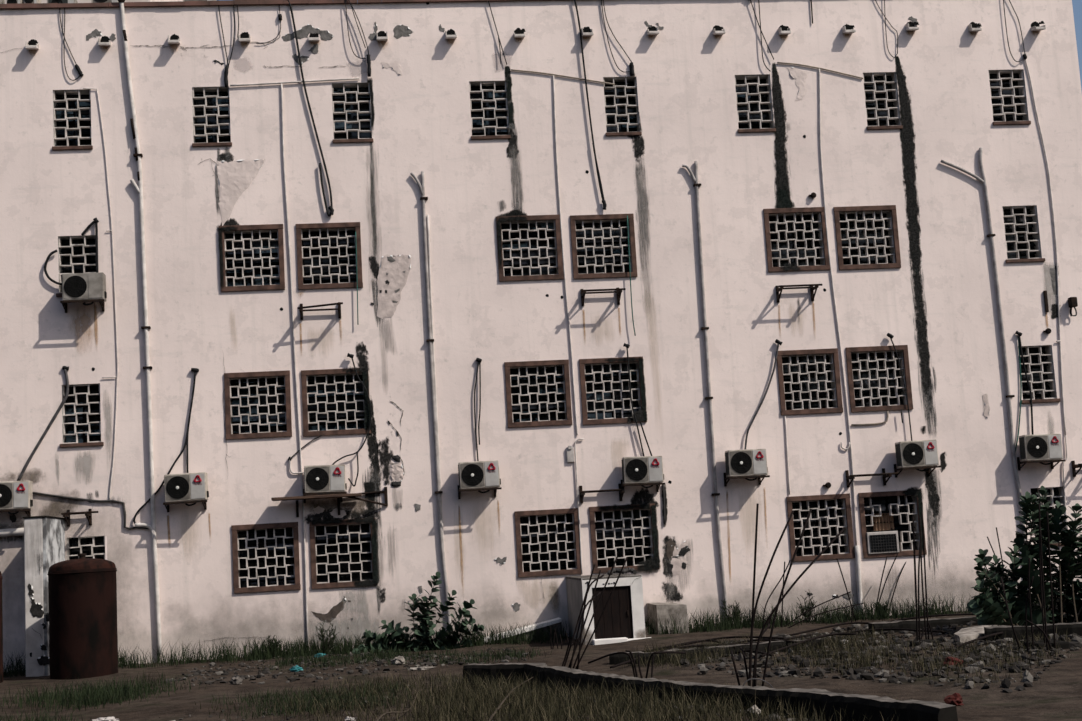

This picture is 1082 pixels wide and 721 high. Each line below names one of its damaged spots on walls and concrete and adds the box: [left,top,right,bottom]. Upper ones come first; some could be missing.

spalling [282,24,334,65]
spalling [393,24,413,39]
peeling [215,159,265,226]
water stain [497,66,527,268]
water stain [772,63,795,208]
peeling [371,255,411,319]
water stain [895,56,936,434]
water stain [598,484,668,573]